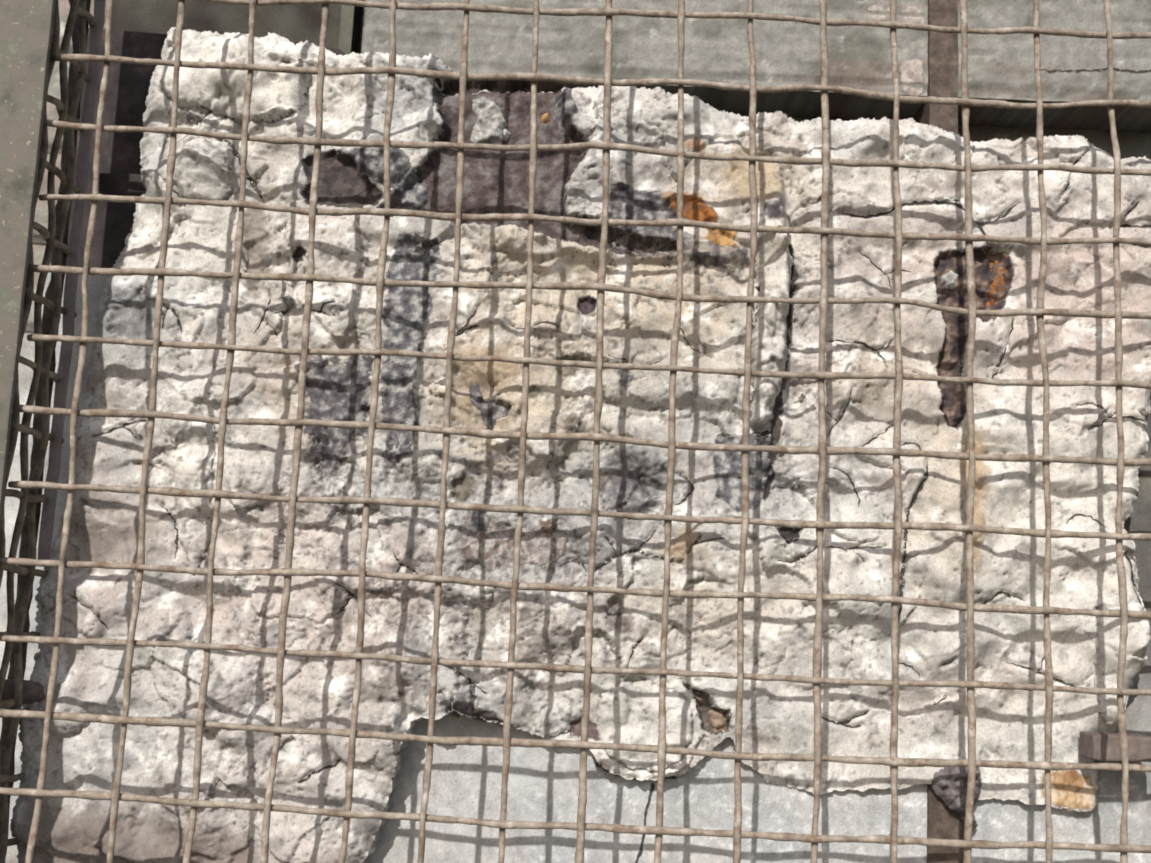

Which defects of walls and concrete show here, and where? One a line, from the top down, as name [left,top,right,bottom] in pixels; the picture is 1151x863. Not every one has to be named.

spalling [300,78,750,269]
corrosion [662,191,737,246]
crack [838,199,1018,246]
crack [1120,201,1151,248]
spalling [294,233,441,480]
crack [717,244,798,500]
crack [827,339,893,367]
spalling [933,246,1014,429]
spalling [455,511,567,571]
spalling [693,690,731,735]
crack [589,751,677,863]
corrosion [1040,770,1095,811]